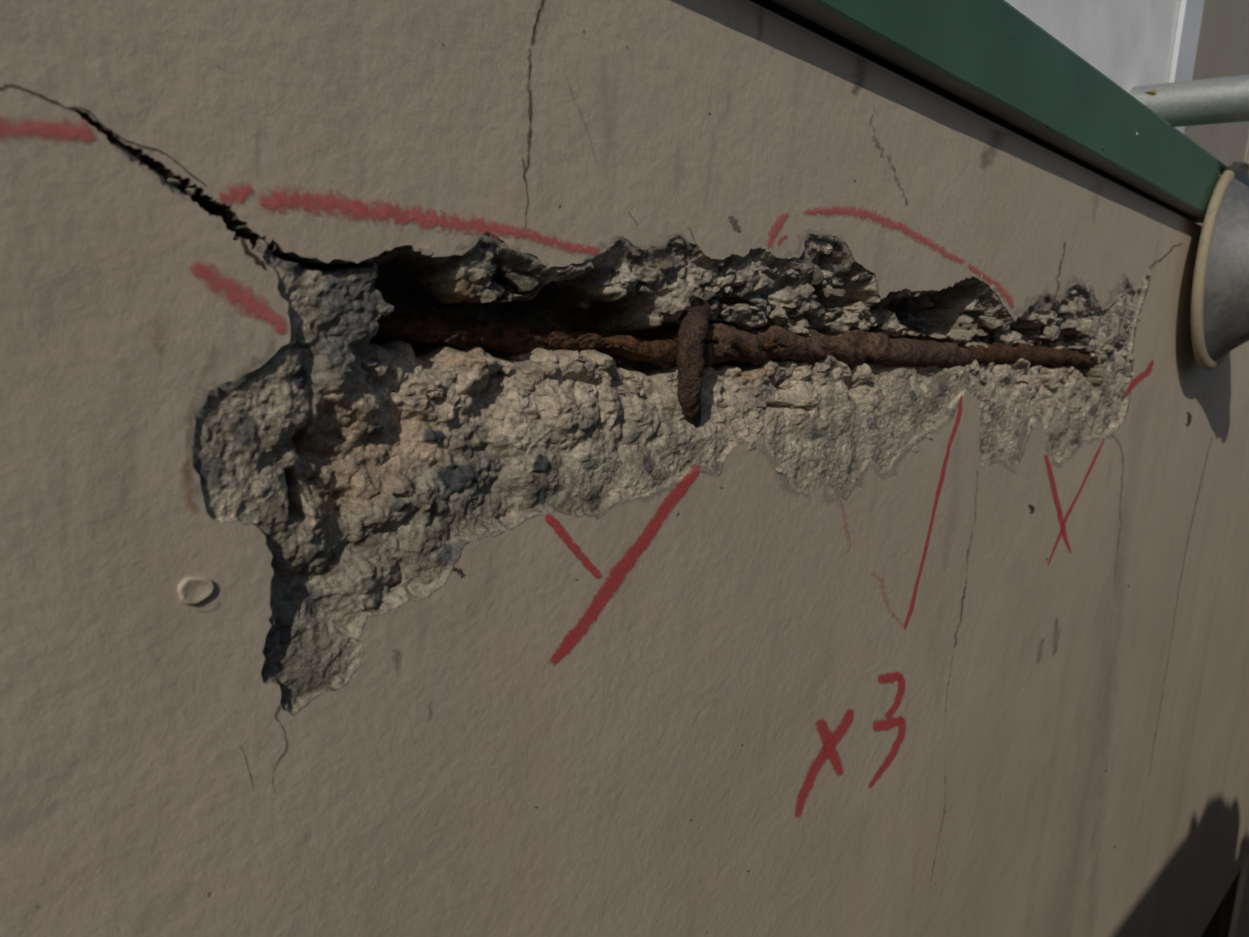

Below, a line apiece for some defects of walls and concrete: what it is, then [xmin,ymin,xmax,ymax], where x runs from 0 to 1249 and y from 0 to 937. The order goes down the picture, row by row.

crack [0,84,276,270]
crack [522,0,544,212]
spalling [184,229,1151,715]